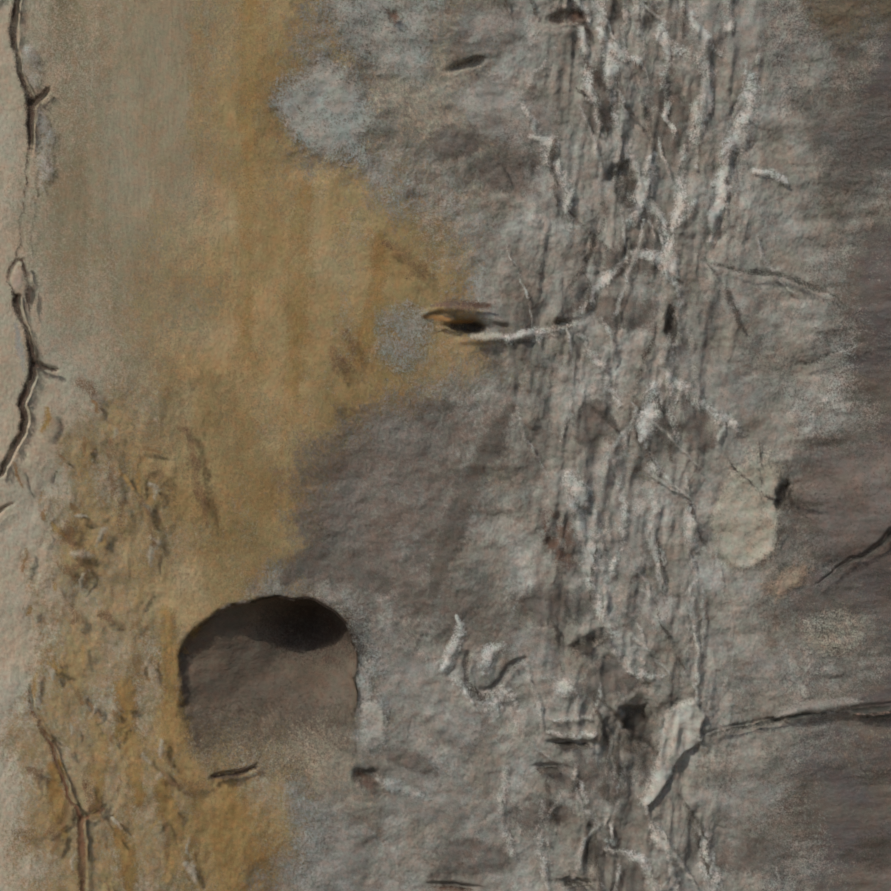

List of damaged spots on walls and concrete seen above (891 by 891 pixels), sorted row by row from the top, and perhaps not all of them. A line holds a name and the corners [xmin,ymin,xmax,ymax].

crack [0,0,57,477]
crack [27,688,110,891]
leakage [0,0,553,803]
spalling [215,0,891,891]
leakage [487,0,891,891]
crack [699,696,891,739]